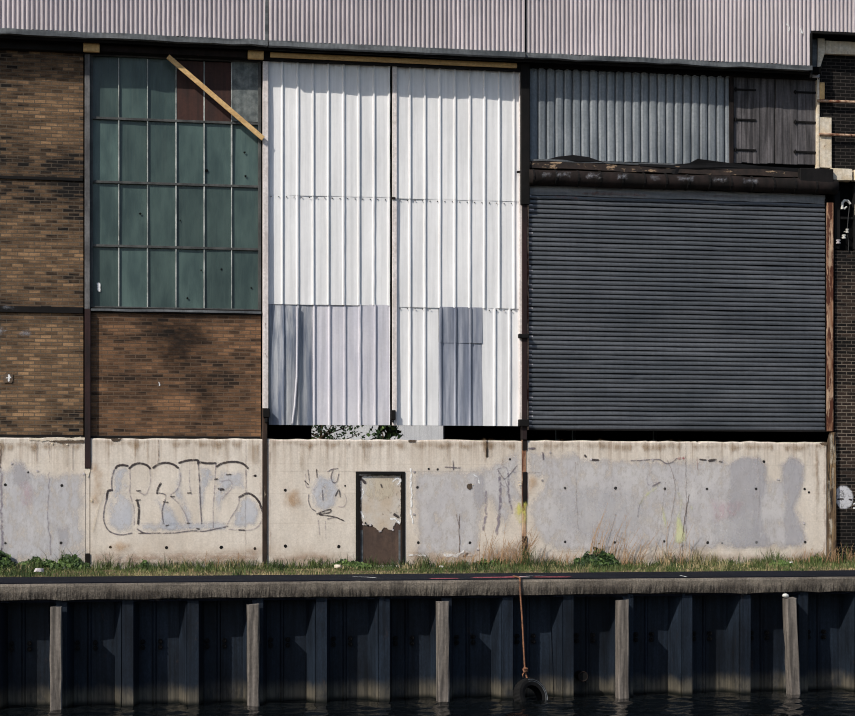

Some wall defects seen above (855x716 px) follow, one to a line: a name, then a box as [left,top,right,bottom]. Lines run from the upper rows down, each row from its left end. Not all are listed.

peeling [360,475,401,532]
peeling [413,457,522,554]